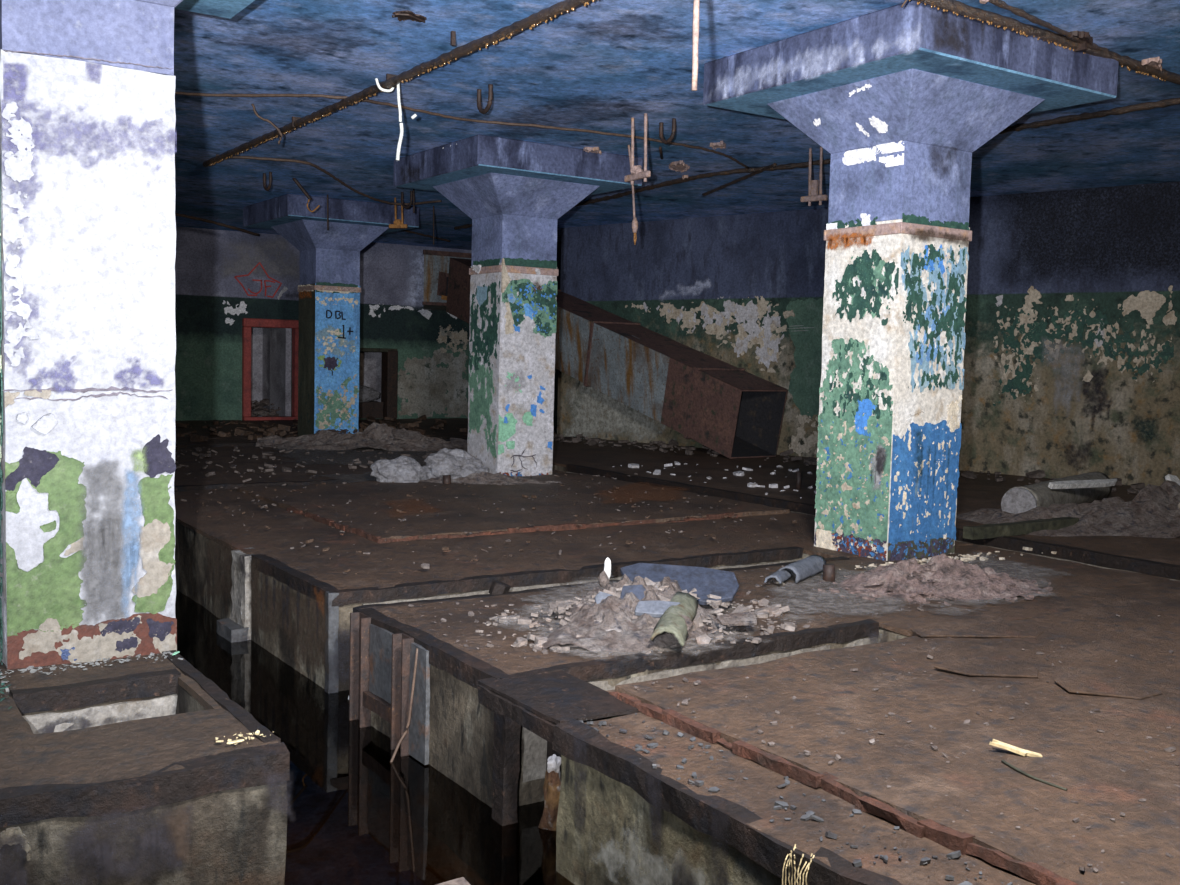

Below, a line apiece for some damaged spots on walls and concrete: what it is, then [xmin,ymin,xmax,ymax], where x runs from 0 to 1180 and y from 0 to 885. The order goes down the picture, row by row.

rust [827,233,872,250]
peeling [826,213,878,230]
peeling [902,213,969,230]
rust [911,230,968,246]
peeling [0,102,183,709]
peeling [277,258,558,458]
rust [661,357,788,459]
peeling [625,244,969,561]
damp [1049,346,1111,420]
peeling [993,285,1177,406]